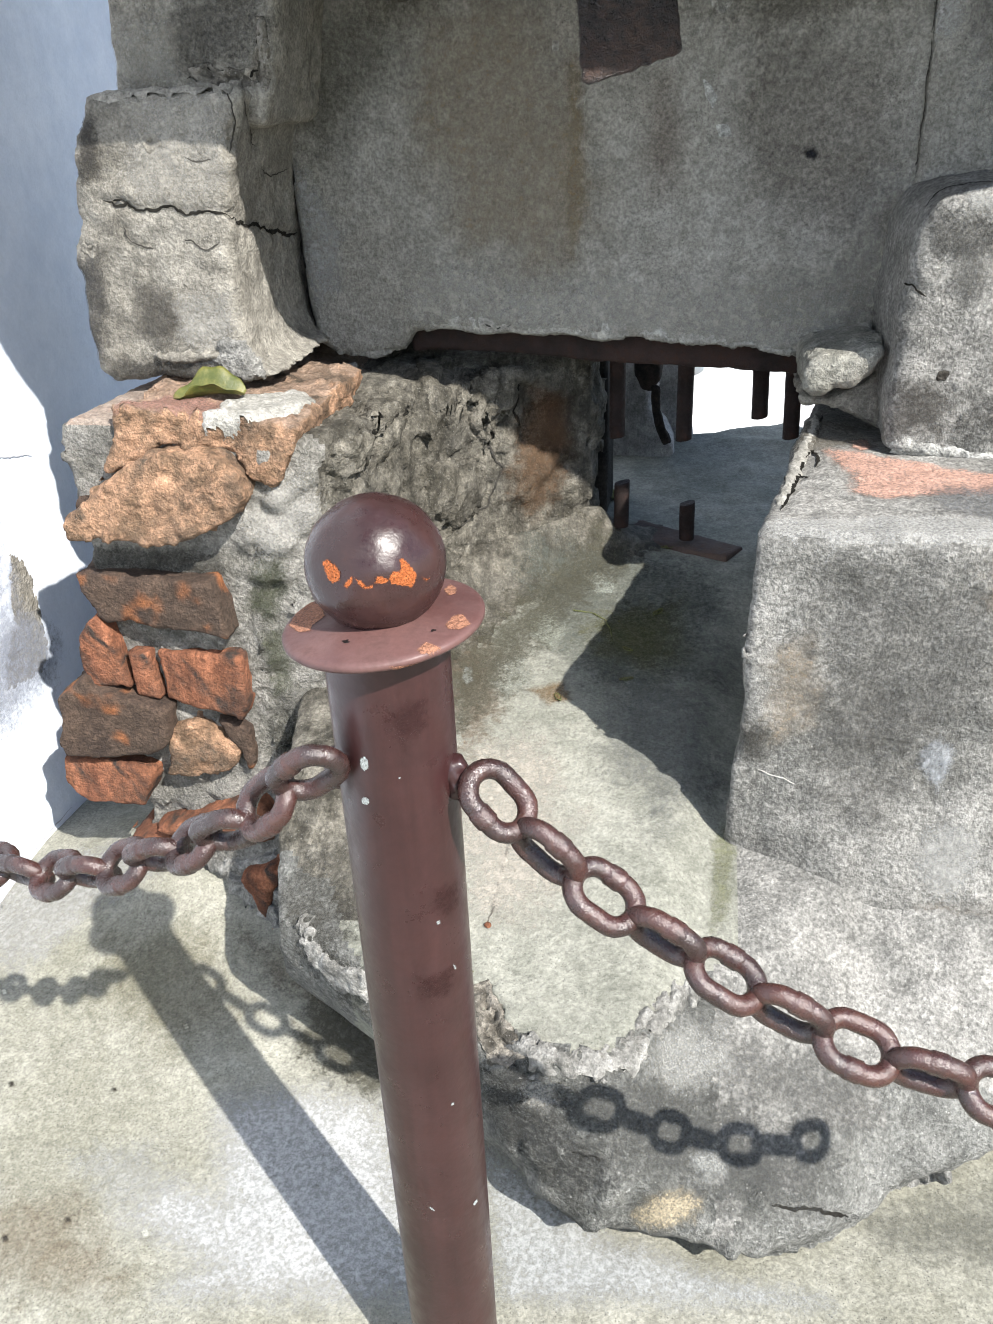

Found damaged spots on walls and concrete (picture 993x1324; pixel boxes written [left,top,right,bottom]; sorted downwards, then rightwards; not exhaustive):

crack [185,39,271,163]
crack [915,0,938,165]
crack [926,181,992,206]
crack [103,164,324,345]
crack [780,416,823,511]
spalling [474,979,699,1084]
leakage [634,1193,703,1228]